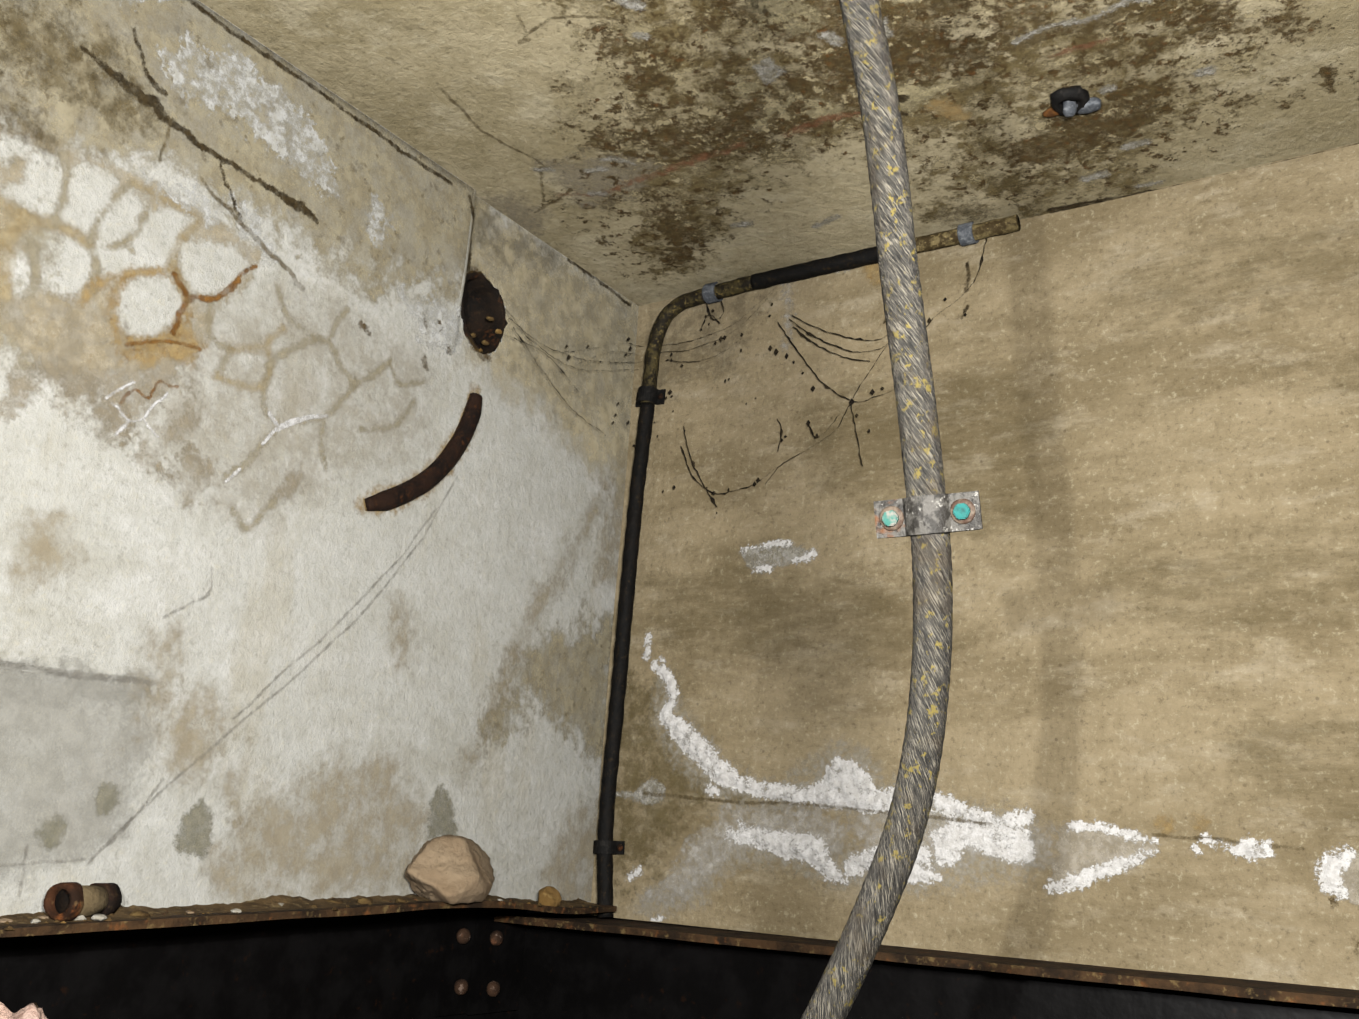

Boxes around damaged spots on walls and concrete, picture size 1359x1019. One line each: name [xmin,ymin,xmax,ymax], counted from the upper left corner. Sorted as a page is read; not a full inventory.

crack [192,2,475,274]
water stain [879,0,1359,223]
crack [0,29,424,531]
water stain [0,0,868,427]
crack [962,262,970,313]
rust [357,388,482,514]
water stain [478,614,613,759]
water stain [175,800,213,856]
water stain [616,632,896,922]
water stain [908,790,1159,895]
water stain [1190,832,1275,864]
water stain [1314,843,1359,905]